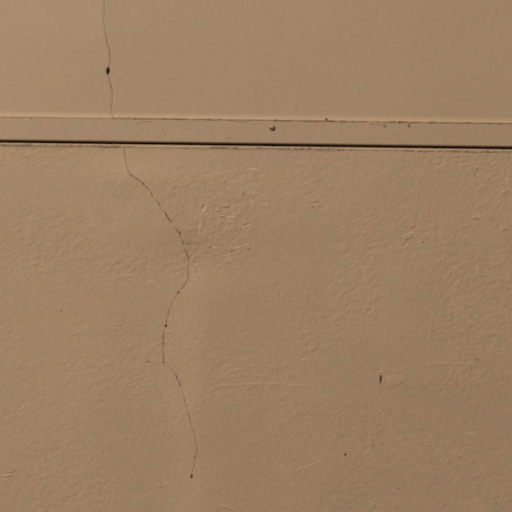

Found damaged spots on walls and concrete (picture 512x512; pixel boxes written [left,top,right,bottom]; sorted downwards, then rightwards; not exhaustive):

crack [103,0,118,119]
crack [0,145,512,478]